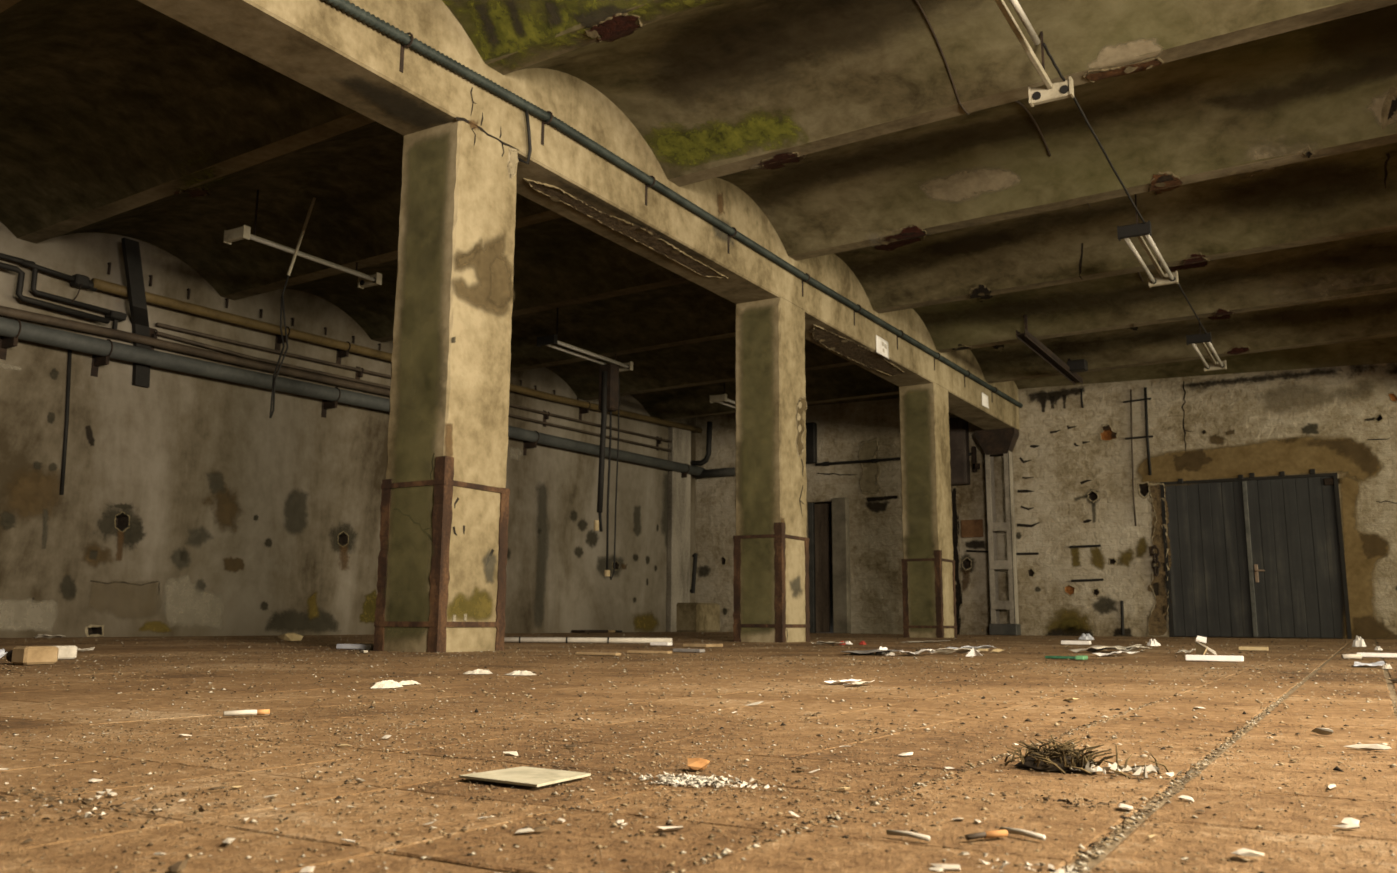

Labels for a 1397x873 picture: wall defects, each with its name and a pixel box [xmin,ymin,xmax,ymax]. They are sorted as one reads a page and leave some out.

spalling [585,13,646,43]
crack [456,87,520,157]
spalling [754,152,807,170]
spalling [1148,171,1183,195]
spalling [875,226,927,251]
water stain [344,79,513,637]
water stain [1186,369,1335,388]
water stain [172,474,258,568]
water stain [285,491,307,532]
water stain [1137,423,1397,640]
water stain [224,558,244,572]